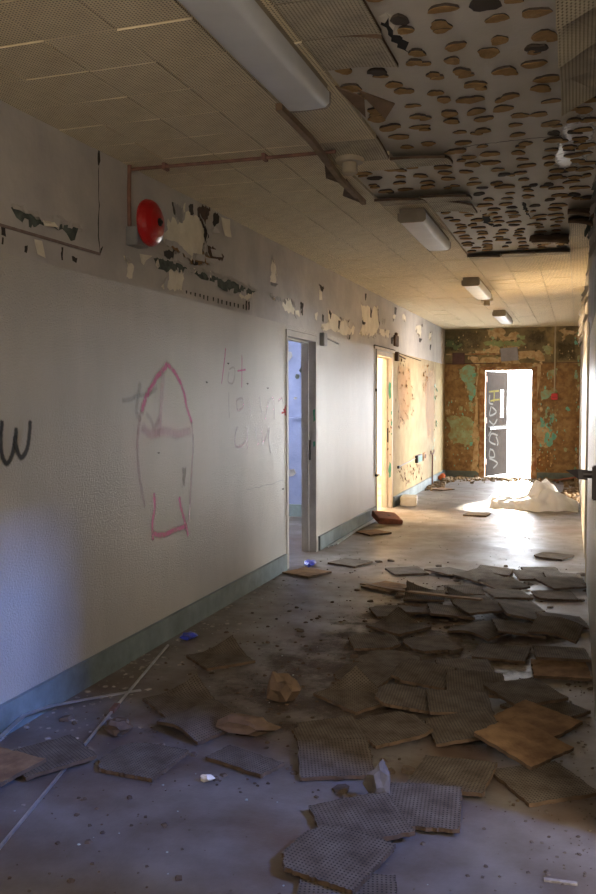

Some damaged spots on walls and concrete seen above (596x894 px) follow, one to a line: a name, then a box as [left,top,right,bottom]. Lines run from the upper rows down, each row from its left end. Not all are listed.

spalling [375,13,409,52]
spalling [11,203,83,263]
peeling [123,202,257,310]
peeling [269,256,304,317]
flaking render [584,163,596,259]
peeling [315,293,406,344]
peeling [387,270,589,473]